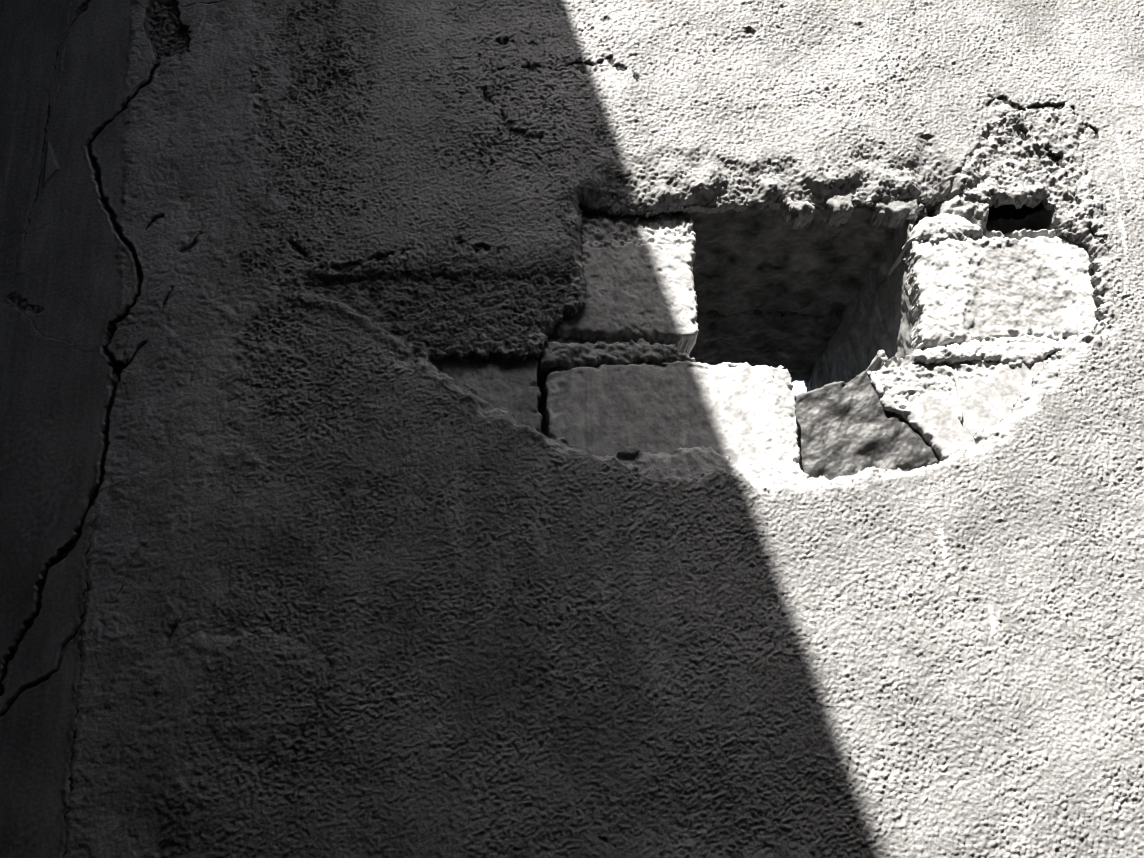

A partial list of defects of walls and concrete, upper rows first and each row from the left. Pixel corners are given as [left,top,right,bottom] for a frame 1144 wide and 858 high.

crack [24,0,91,243]
crack [0,63,159,858]
spalling [306,135,1120,495]